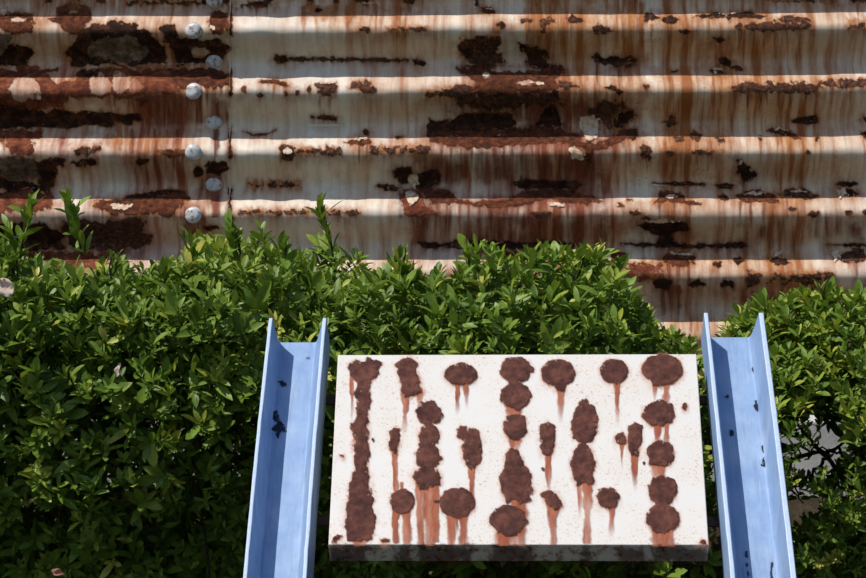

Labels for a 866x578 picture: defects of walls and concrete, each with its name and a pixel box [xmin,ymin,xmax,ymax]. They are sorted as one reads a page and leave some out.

corrosion [240,0,272,12]
corrosion [847,0,866,32]
corrosion [710,56,743,74]
corrosion [257,78,338,102]
corrosion [730,77,866,108]
corrosion [0,0,246,270]
corrosion [294,0,693,261]
corrosion [662,115,725,162]
corrosion [246,180,302,192]
corrosion [238,207,362,219]
corrosion [605,190,706,311]